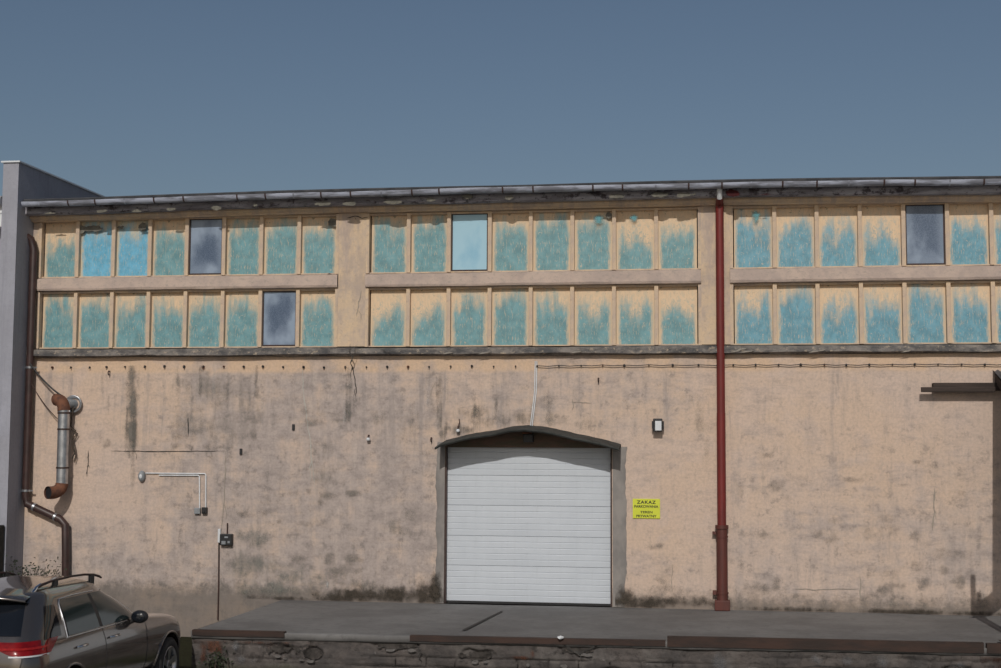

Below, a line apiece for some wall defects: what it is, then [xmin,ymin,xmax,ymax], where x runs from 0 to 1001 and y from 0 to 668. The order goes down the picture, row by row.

crack [349,347,357,396]
leakage [126,368,137,449]
leakage [315,569,441,602]